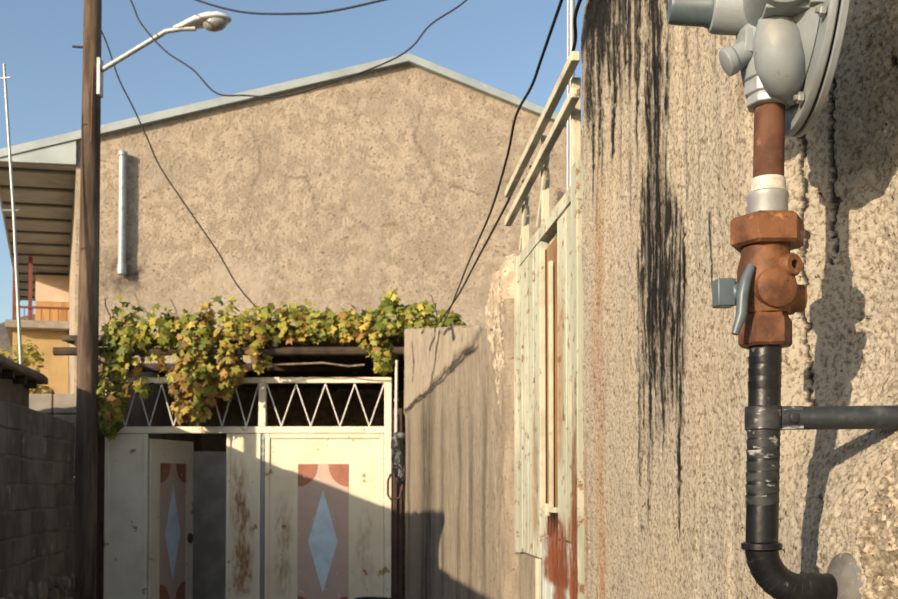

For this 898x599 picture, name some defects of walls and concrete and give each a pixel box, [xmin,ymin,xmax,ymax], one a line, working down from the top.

flaking render [485,253,516,404]
damp [581,0,686,498]
corrosion [235,495,250,591]
corrosion [543,433,578,599]